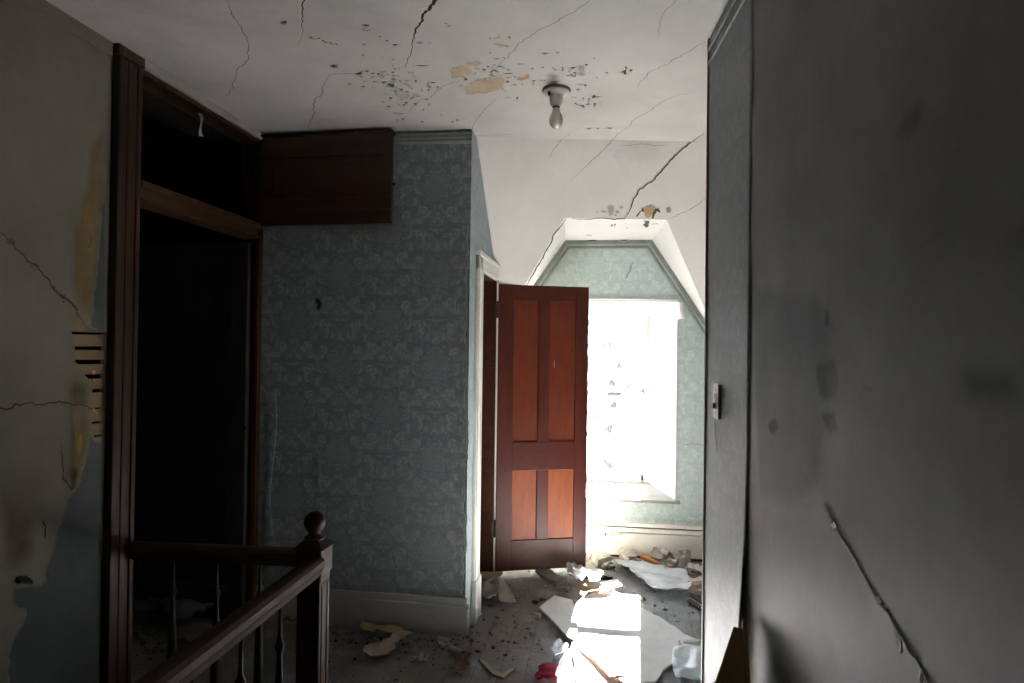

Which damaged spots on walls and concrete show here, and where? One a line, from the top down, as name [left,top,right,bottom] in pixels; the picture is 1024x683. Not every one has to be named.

crack [226,0,249,94]
crack [402,0,437,67]
peeling [448,35,632,108]
peeling [595,204,624,217]
crack [526,94,707,286]
crack [0,232,78,311]
crack [0,401,91,412]
flaking render [6,199,105,683]